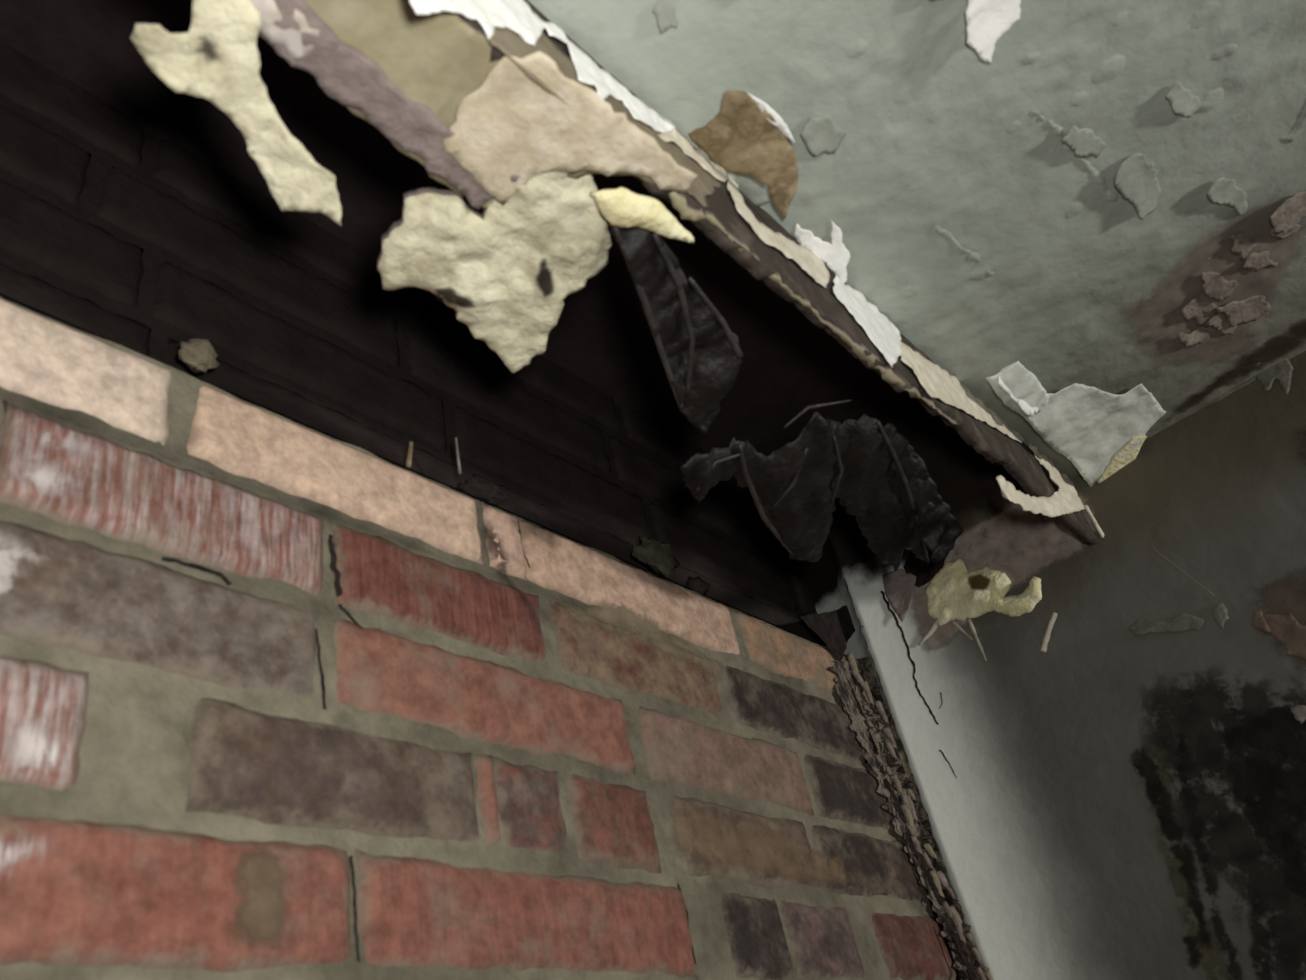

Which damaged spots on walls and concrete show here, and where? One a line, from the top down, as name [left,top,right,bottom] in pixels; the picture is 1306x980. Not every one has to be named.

flaking render [131,0,342,226]
flaking render [410,0,1106,651]
crack [349,856,360,962]
crack [828,591,994,980]
water stain [1132,677,1306,980]